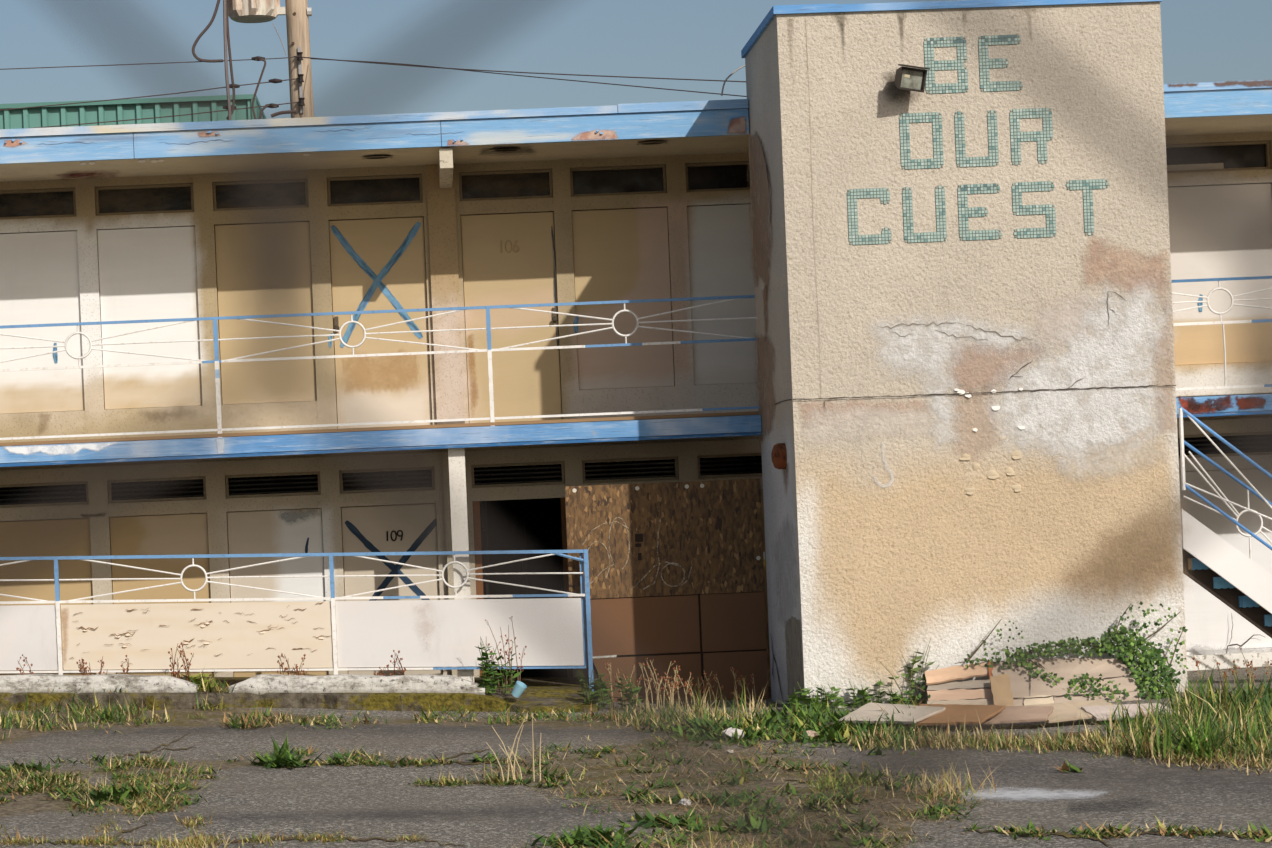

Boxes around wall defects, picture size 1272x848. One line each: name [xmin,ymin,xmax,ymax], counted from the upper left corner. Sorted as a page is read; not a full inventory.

peeling [4,139,26,147]
peeling [573,130,617,140]
crack [767,18,1176,411]
corrosion [1153,328,1251,429]